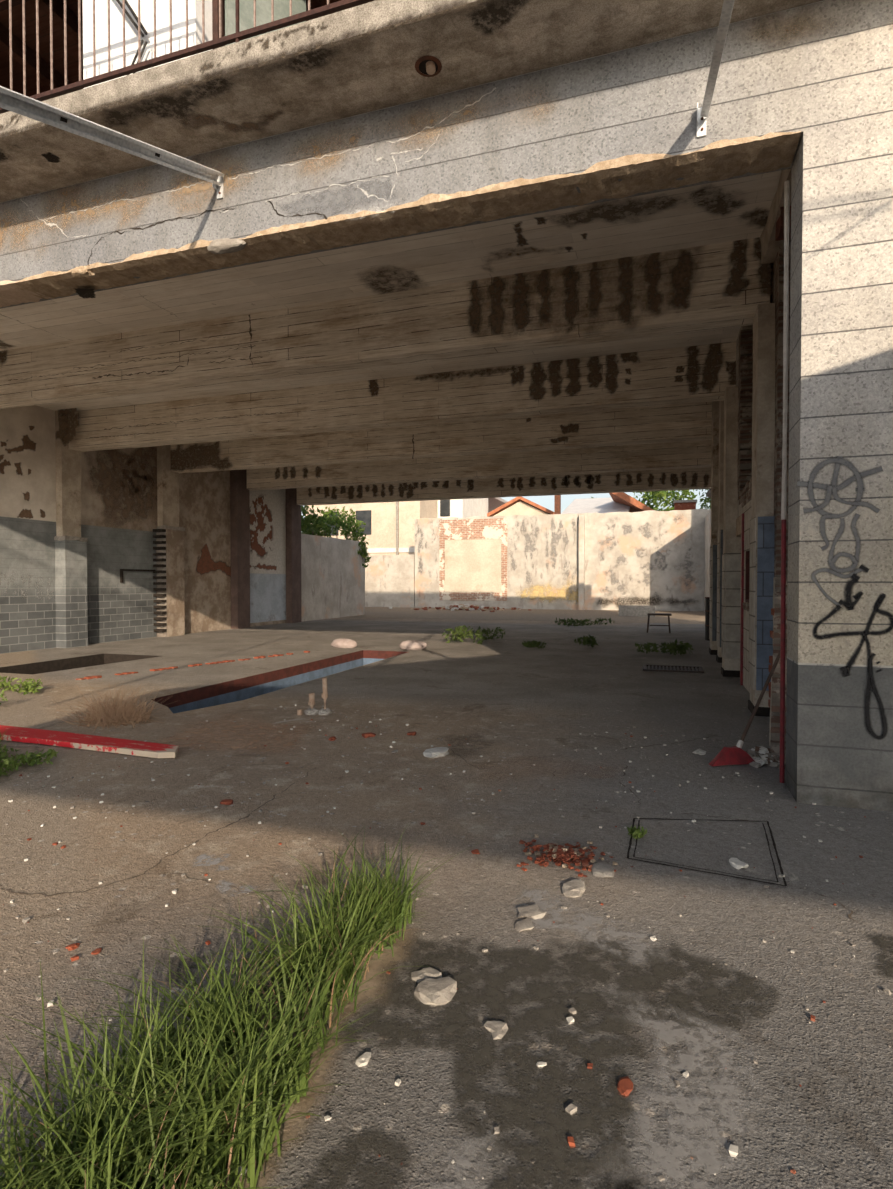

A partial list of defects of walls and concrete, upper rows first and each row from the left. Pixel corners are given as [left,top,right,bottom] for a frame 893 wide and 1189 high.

damp [73,0,528,132]
crack [20,87,496,266]
damp [535,187,774,296]
damp [469,248,699,335]
crack [8,299,262,381]
damp [416,352,638,400]
damp [675,343,736,393]
peeling [0,426,36,475]
peeling [18,492,45,518]
peeling [196,544,231,576]
peeling [250,496,277,570]
crack [0,768,316,896]